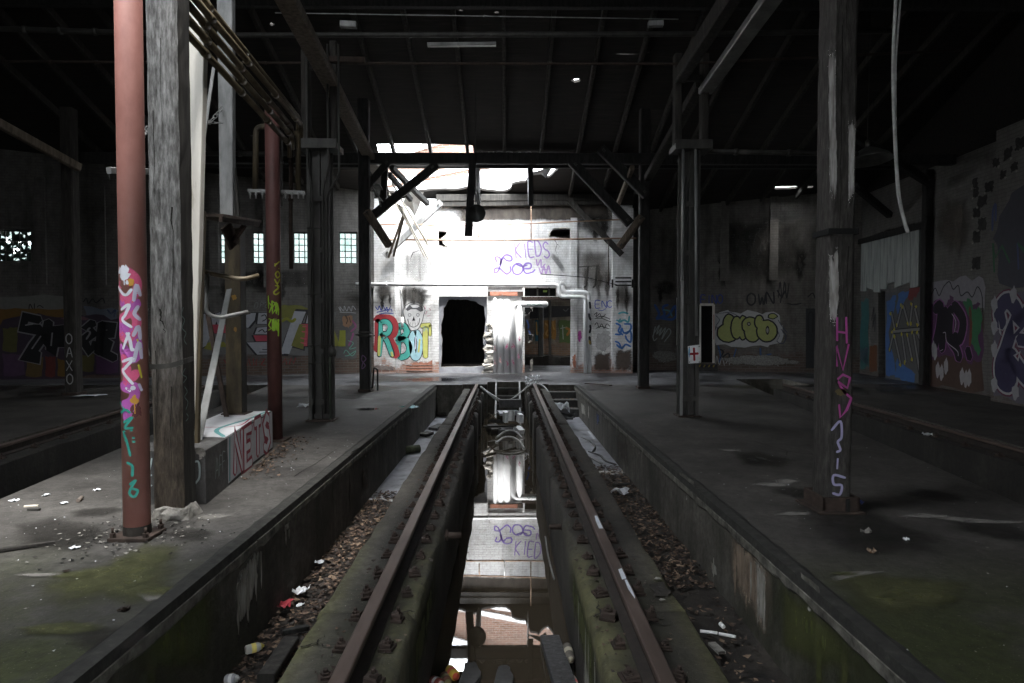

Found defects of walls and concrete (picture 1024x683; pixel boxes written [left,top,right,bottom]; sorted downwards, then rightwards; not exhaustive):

damp [237,552,262,635]
damp [750,563,765,628]